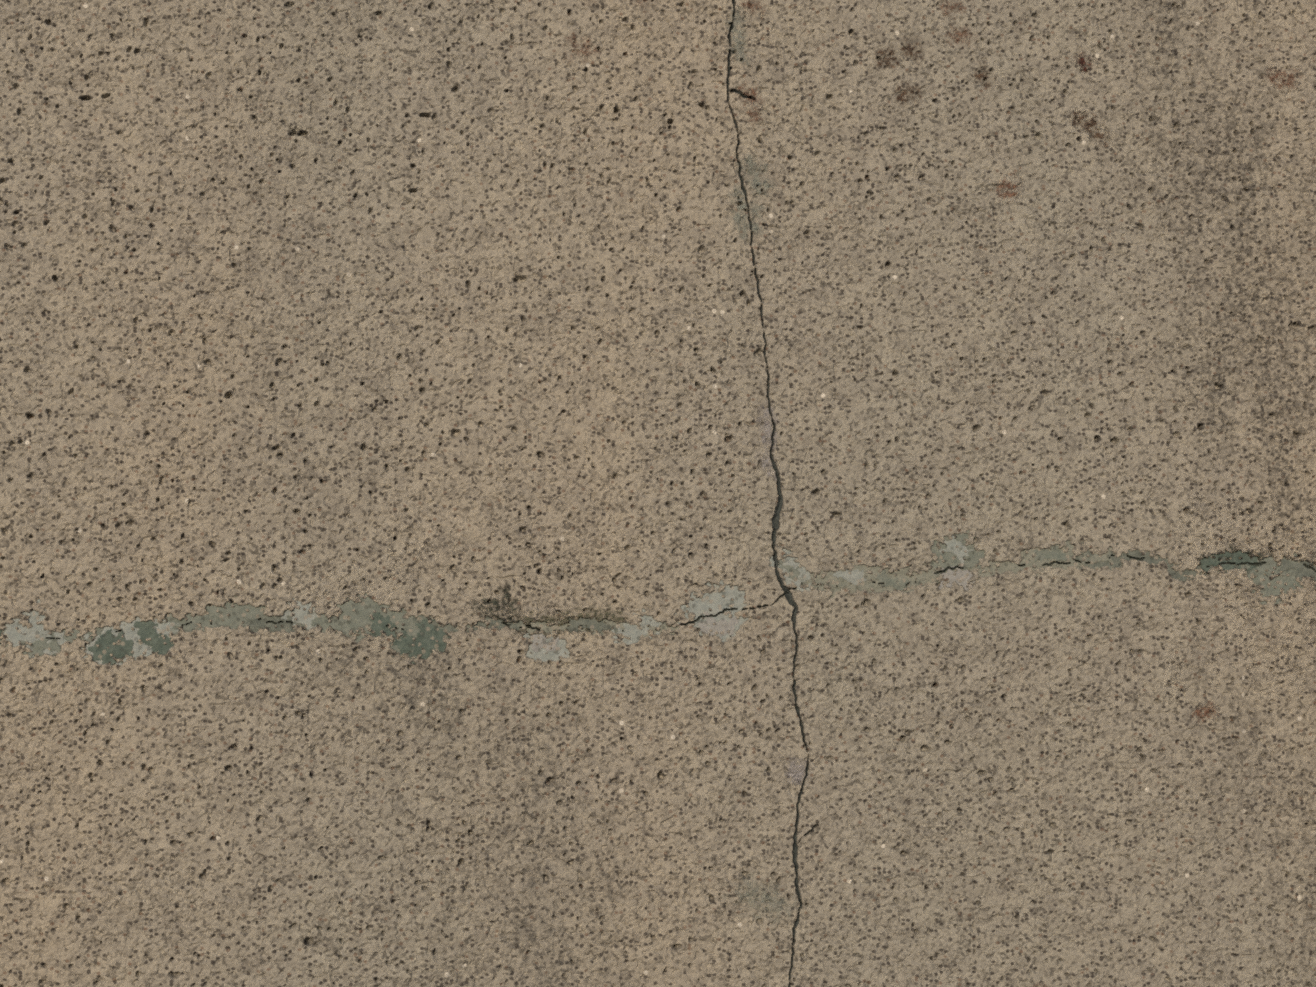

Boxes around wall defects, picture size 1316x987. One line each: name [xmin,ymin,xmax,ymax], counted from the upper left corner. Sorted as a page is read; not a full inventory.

crack [386,0,1316,987]
peeling [769,530,985,593]
peeling [1020,540,1129,571]
peeling [1200,551,1316,605]
crack [1,616,225,646]
peeling [0,593,450,665]
crack [258,616,351,630]
peeling [523,609,662,665]
peeling [675,580,748,642]